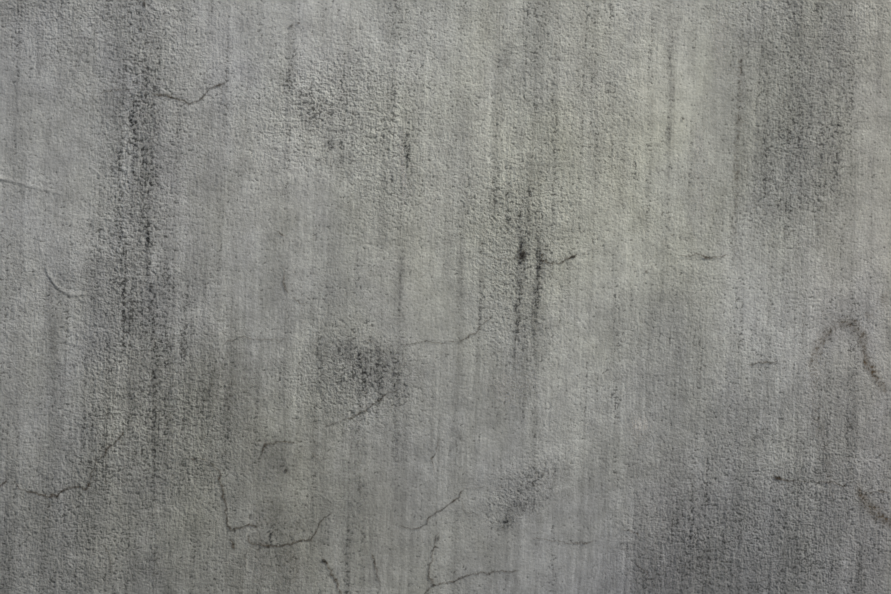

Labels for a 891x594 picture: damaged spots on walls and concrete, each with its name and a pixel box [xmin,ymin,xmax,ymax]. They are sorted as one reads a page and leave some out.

crack [156,83,224,105]
crack [0,432,124,498]
crack [191,458,330,548]
crack [407,492,511,593]